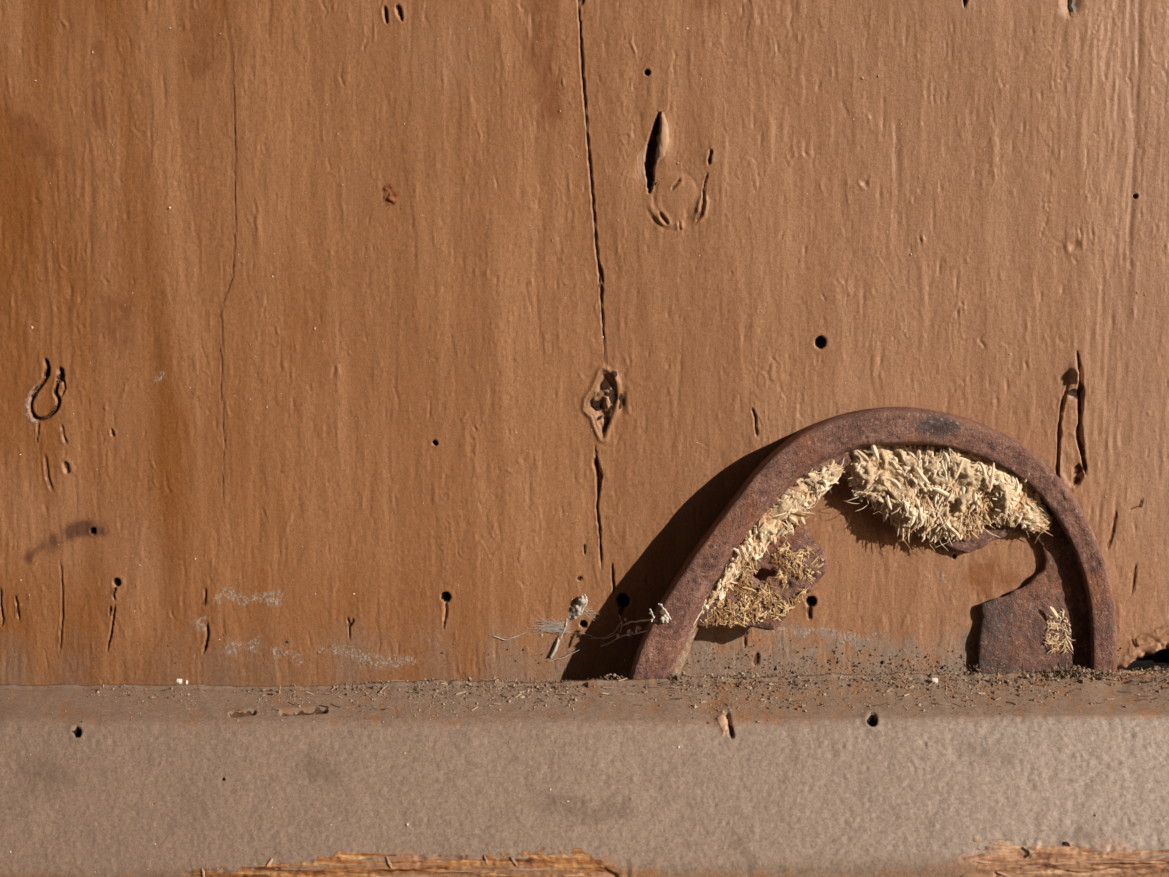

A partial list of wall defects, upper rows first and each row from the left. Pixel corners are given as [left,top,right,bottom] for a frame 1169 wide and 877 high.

crack [578,0,607,372]
crack [577,447,615,594]
rust [628,407,1117,680]
peeling [1125,625,1169,671]
peeling [182,847,622,877]
peeling [961,831,1169,877]